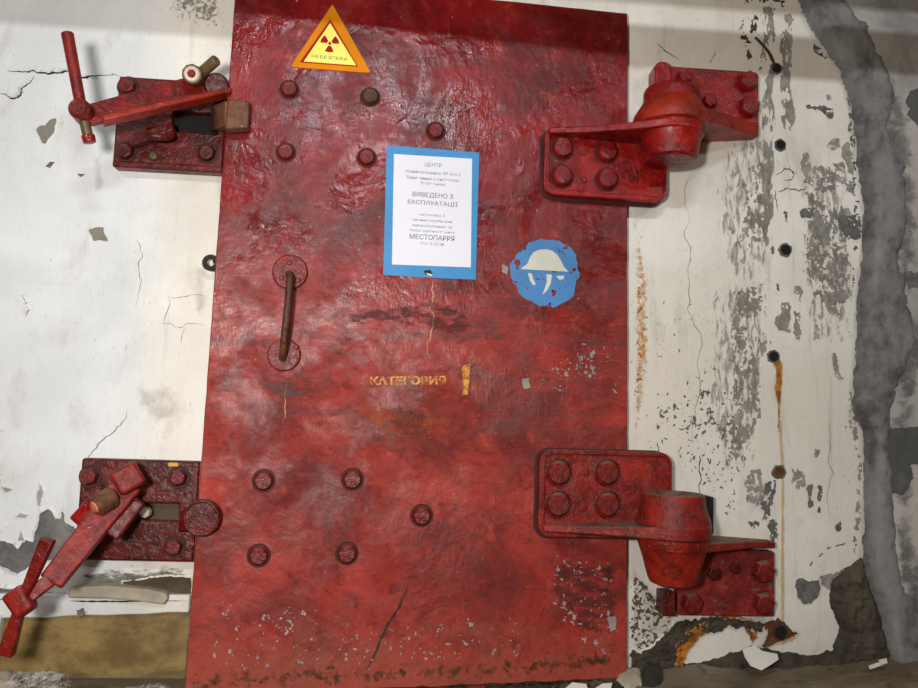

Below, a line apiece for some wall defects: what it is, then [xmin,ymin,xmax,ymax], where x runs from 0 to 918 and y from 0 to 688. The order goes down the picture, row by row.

crack [0,66,123,99]
peeling [711,0,862,468]
corrosion [631,254,648,362]
corrosion [773,360,783,465]
peeling [885,425,918,497]
peeling [0,480,77,577]
peeling [744,465,823,541]
spalling [121,574,193,595]
water stain [899,530,918,612]
corrosion [674,631,705,666]
spalling [627,615,798,670]
corrosion [719,616,758,643]